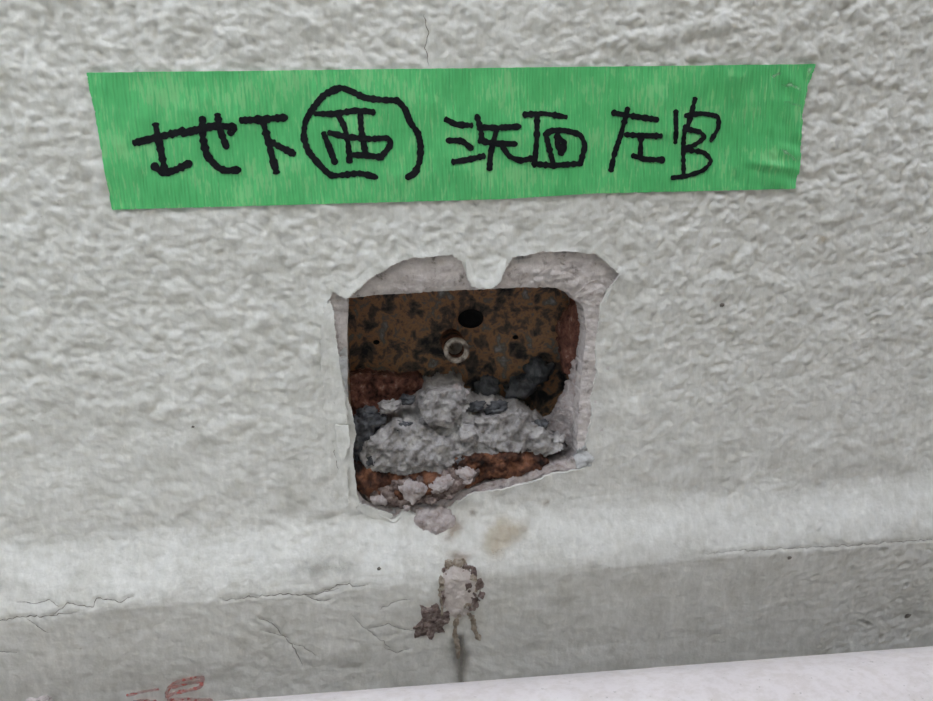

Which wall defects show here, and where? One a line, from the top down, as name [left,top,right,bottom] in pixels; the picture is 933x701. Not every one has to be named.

spalling [320,251,625,519]
crack [0,596,134,633]
crack [225,583,365,666]
crack [352,599,414,653]
peeling [413,558,485,659]